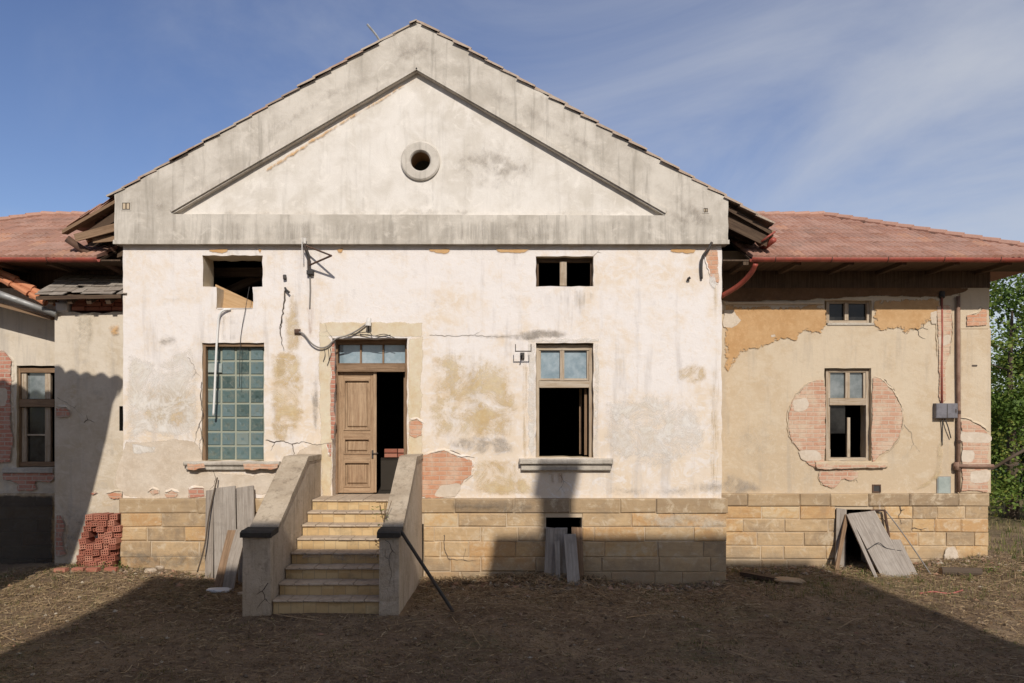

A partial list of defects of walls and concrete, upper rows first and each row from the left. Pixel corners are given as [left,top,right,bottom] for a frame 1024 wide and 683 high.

peeling [671,249,988,401]
spalling [0,351,55,491]
peeling [91,439,278,499]
spalling [409,417,424,438]
spalling [422,448,529,498]
spalling [786,375,905,489]
spalling [961,417,992,492]